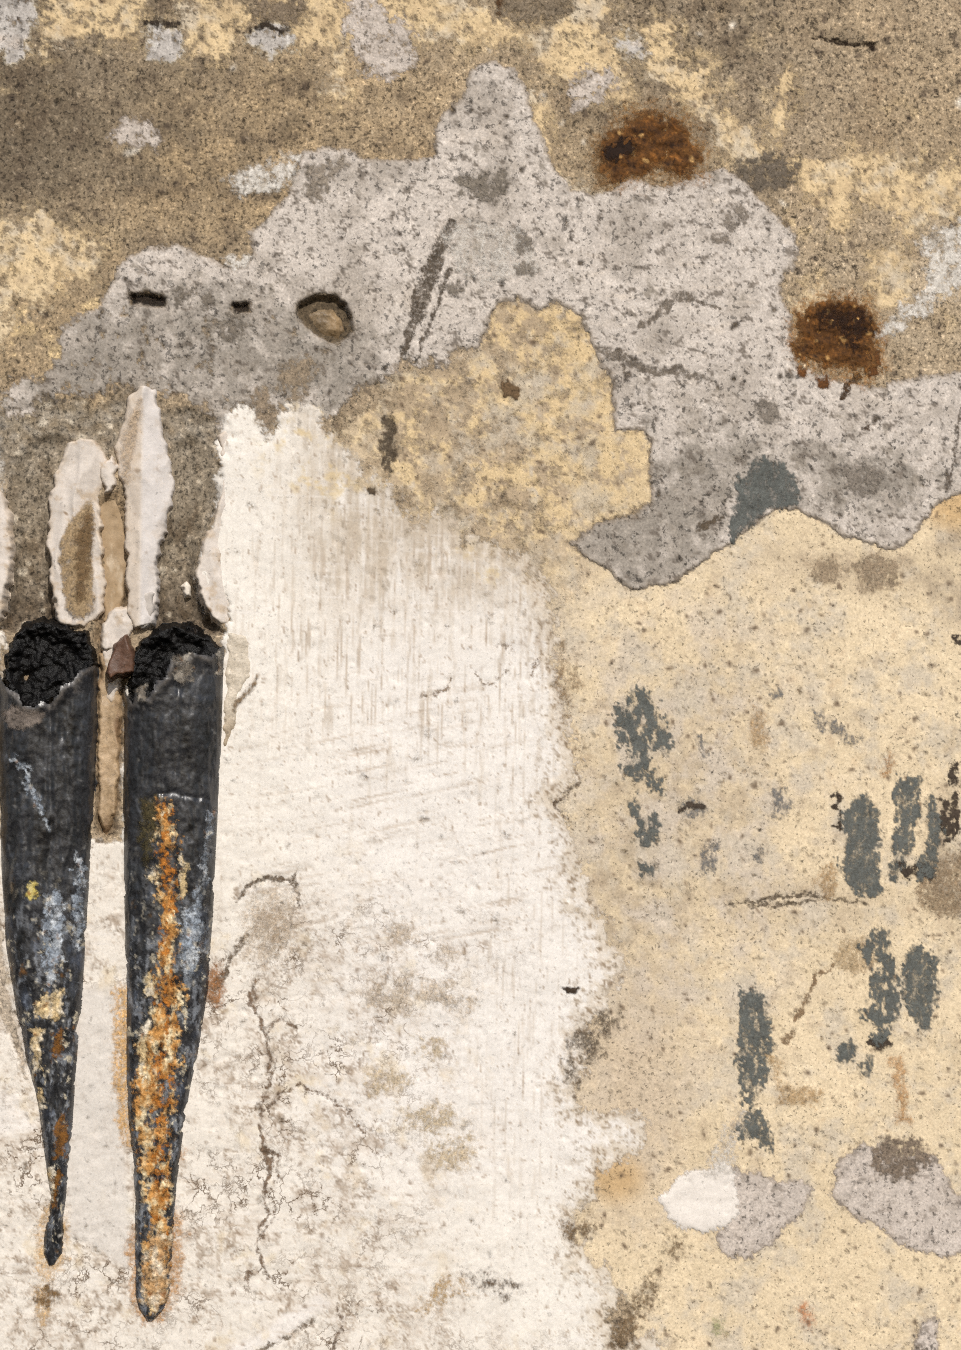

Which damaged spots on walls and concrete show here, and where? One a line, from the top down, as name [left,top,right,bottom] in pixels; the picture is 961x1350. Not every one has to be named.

corrosion [592,106,710,187]
corrosion [789,295,886,389]
flaking render [217,431,228,456]
flaking render [45,386,175,666]
flaking render [180,581,191,599]
flaking render [193,480,229,626]
flaking render [106,677,131,706]
crack [238,873,300,906]
corrosion [207,964,226,1007]
corrosion [110,795,190,1322]
crack [214,934,366,1281]
corrosion [33,1113,71,1326]